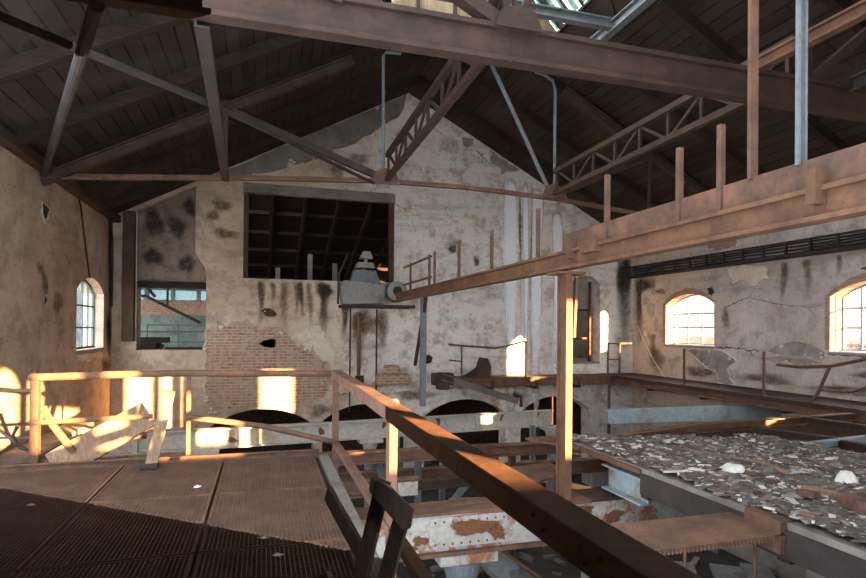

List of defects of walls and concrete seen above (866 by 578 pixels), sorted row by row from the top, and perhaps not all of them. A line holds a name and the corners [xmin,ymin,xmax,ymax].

water stain [145,208,184,238]
water stain [144,249,162,264]
water stain [179,256,194,272]
water stain [258,282,333,318]
crack [725,287,820,313]
water stain [618,262,664,370]
crack [715,345,767,355]
peeling [202,307,349,417]
water stain [747,375,782,383]
water stain [825,386,866,396]
corrosion [451,519,505,538]
corrosion [412,536,429,551]